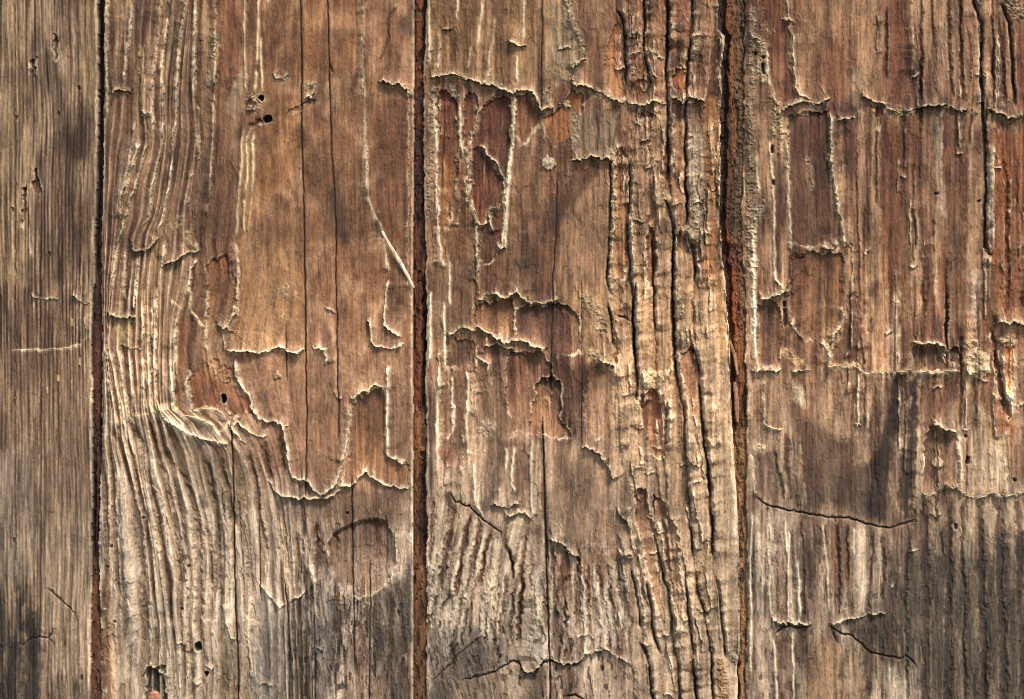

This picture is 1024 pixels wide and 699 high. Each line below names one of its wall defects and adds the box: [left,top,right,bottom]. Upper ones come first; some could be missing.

spalling [159,247,239,332]
spalling [428,0,725,482]
spalling [749,0,963,378]
spalling [184,344,411,502]
crack [432,417,583,699]
crack [753,499,918,528]
spalling [918,419,1024,502]
crack [774,625,917,668]